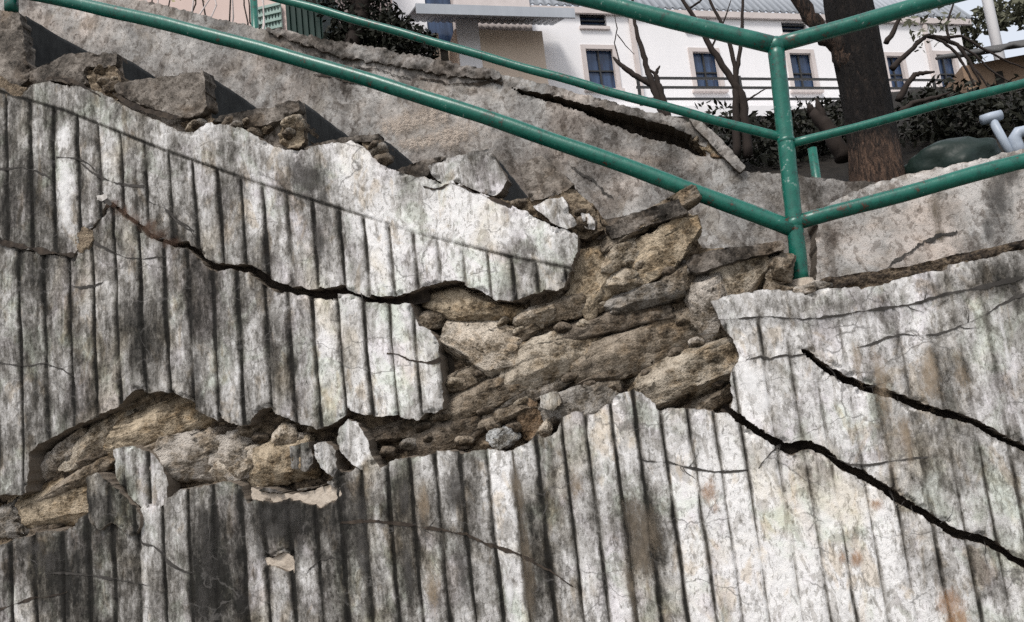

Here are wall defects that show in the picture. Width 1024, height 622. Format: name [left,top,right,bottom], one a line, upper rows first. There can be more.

spalling [86,64,130,101]
spalling [181,114,319,151]
crack [314,65,503,86]
crack [589,116,723,159]
crack [0,156,431,307]
spalling [0,184,795,545]
crack [746,350,1024,451]
crack [637,403,1024,568]